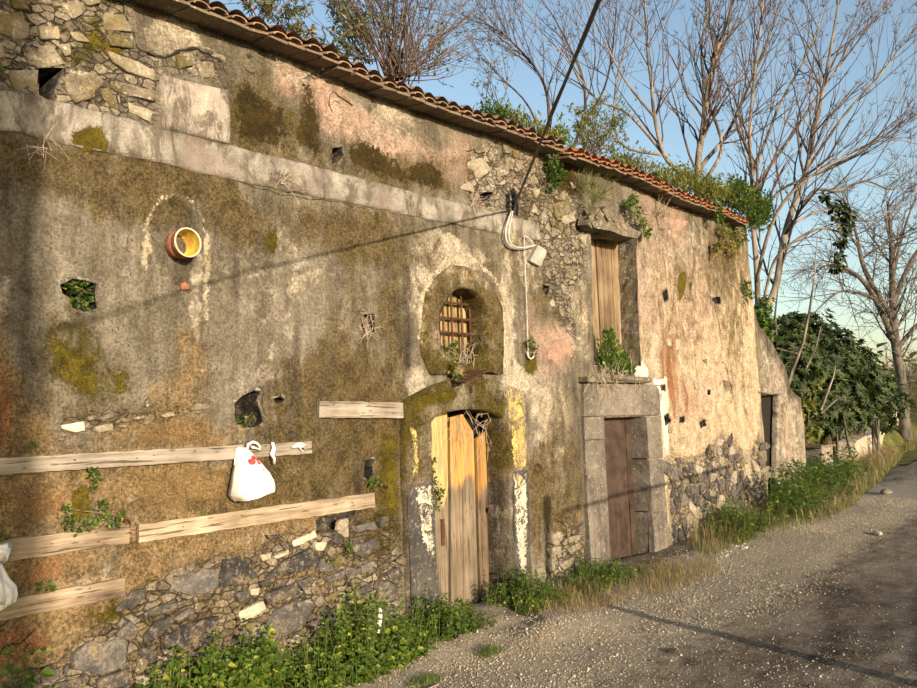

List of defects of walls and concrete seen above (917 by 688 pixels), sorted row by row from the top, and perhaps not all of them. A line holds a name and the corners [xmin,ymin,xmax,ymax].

spalling [35,67,65,101]
spalling [479,191,494,209]
spalling [60,277,100,316]
rust [450,369,499,384]
rust [666,346,688,417]
spalling [232,387,265,428]
peeling [508,395,528,574]
peeling [416,486,434,555]